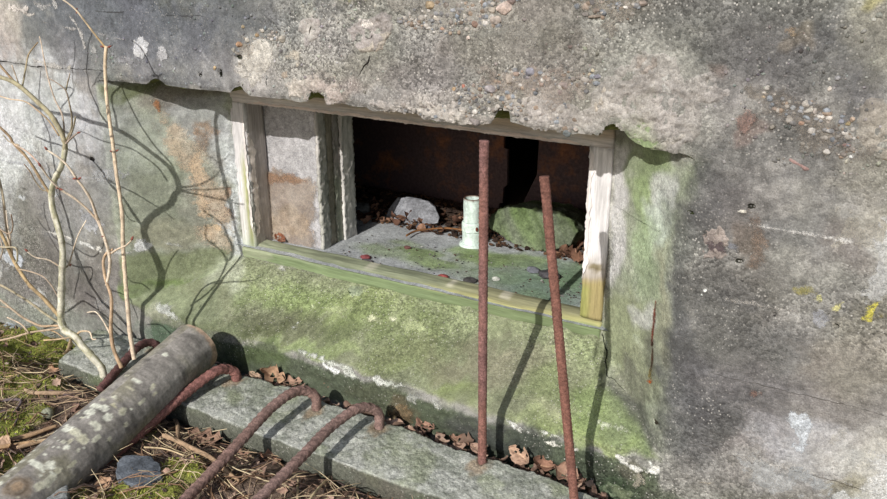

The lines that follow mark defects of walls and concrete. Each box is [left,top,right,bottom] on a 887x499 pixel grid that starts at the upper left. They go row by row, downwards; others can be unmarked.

spalling [231,25,287,88]
peeling [286,17,320,66]
water stain [46,231,152,254]
spalling [242,65,611,499]
water stain [157,303,177,318]
water stain [300,350,402,387]
water stain [406,321,424,332]
crack [602,334,626,392]
corrosion [648,301,656,383]